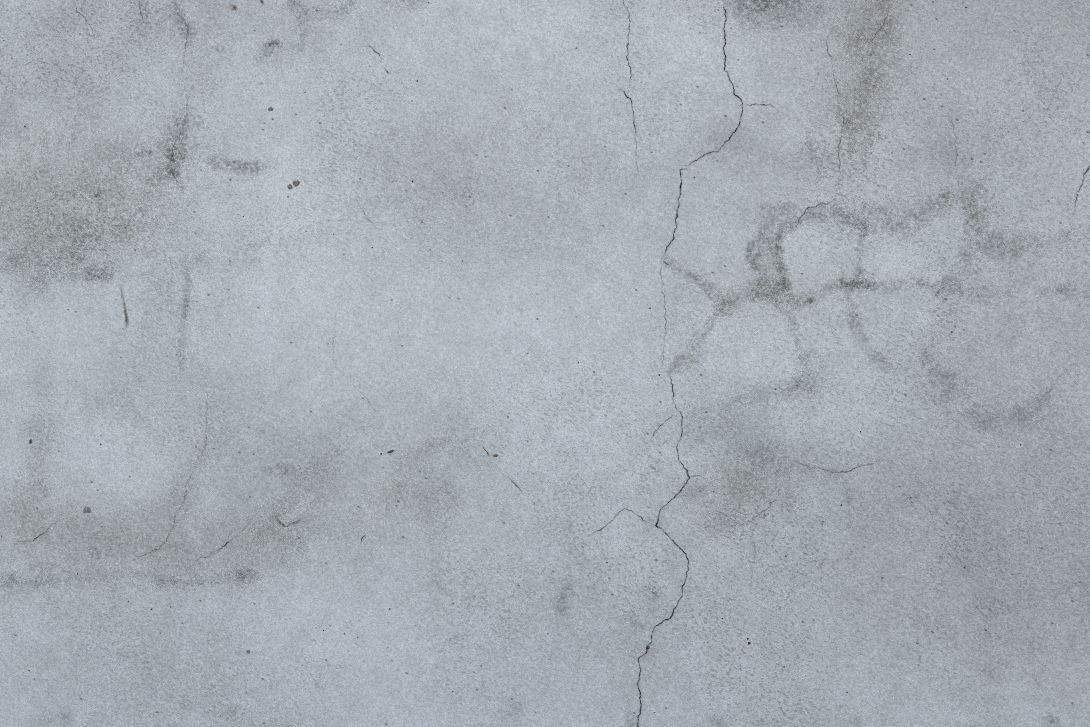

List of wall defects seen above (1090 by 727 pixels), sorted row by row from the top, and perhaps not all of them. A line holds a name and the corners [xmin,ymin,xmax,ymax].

crack [664,7,771,265]
crack [593,379,700,727]